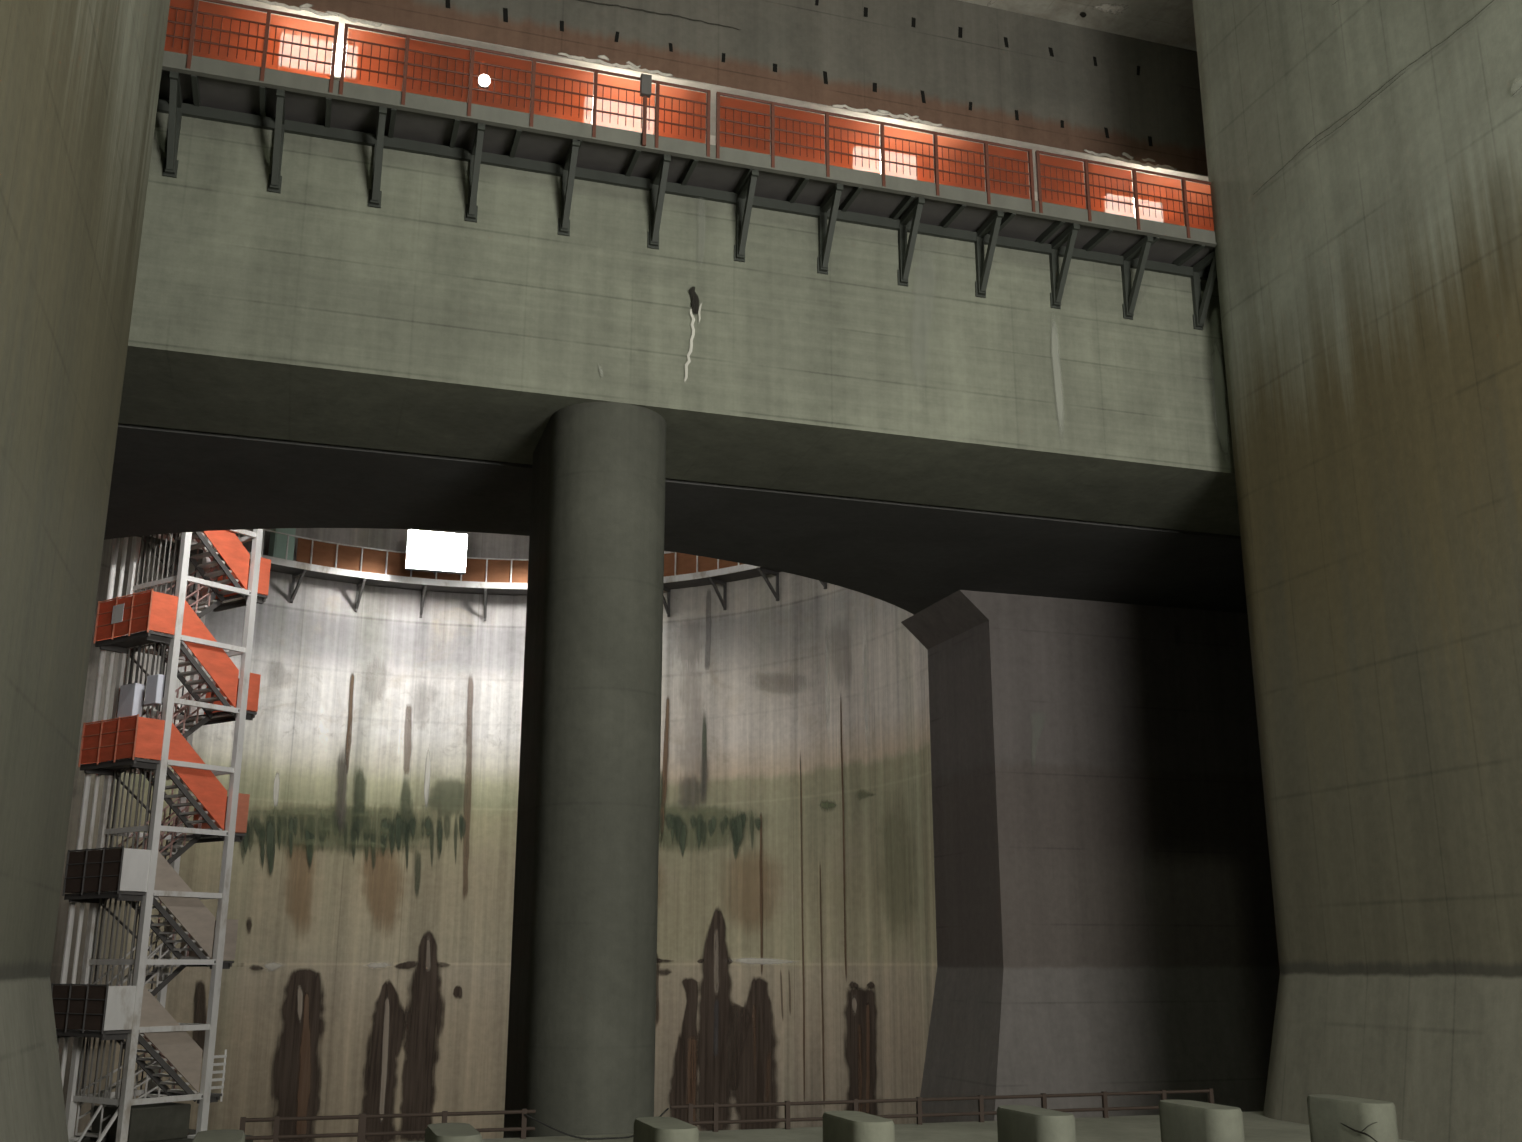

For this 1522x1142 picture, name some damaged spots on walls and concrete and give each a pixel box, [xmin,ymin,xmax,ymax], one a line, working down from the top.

crack [1254,0,1494,194]
crack [685,287,699,380]
rust [660,698,669,840]
crack [1341,1122,1378,1142]